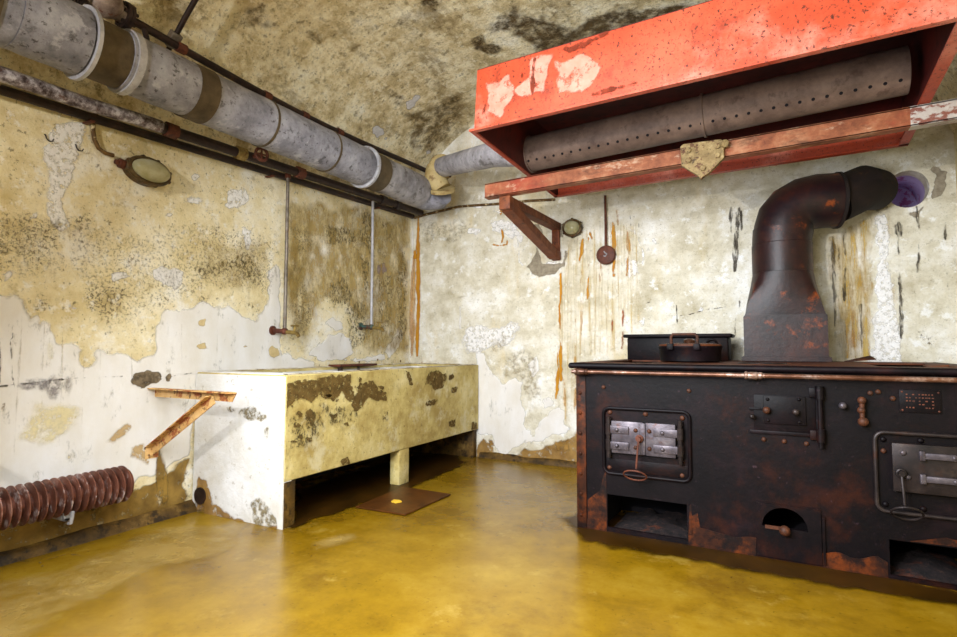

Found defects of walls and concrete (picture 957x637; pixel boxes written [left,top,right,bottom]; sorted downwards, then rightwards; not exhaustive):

peeling [0,66,164,133]
peeling [32,122,85,231]
peeling [225,188,249,209]
water stain [0,214,61,264]
water stain [87,287,124,327]
water stain [197,254,261,281]
water stain [288,204,407,349]
rust [410,218,420,356]
rust [600,212,630,276]
rust [555,342,576,406]
water stain [290,403,357,448]